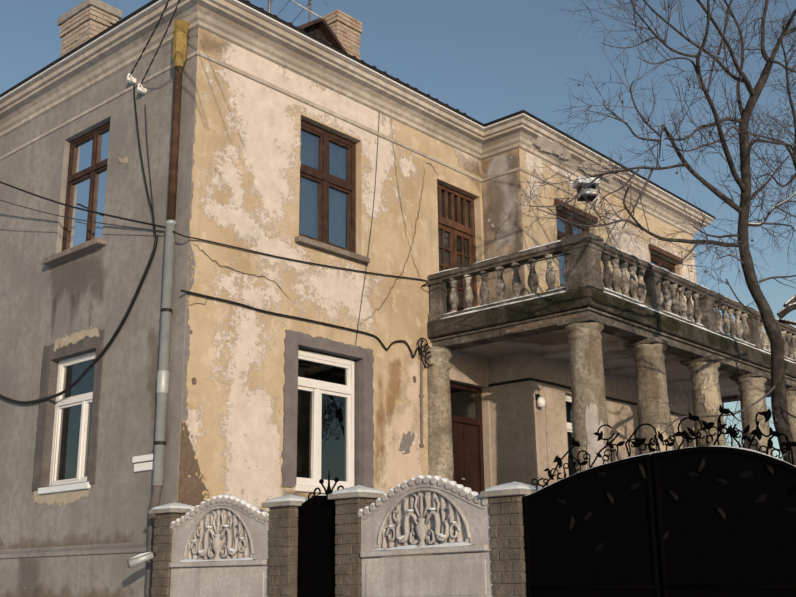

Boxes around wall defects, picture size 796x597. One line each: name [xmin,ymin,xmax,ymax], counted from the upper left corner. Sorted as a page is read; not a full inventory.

crack [193,243,291,300]
peeling [177,34,417,511]
crack [361,128,437,324]
peeling [585,403,608,470]